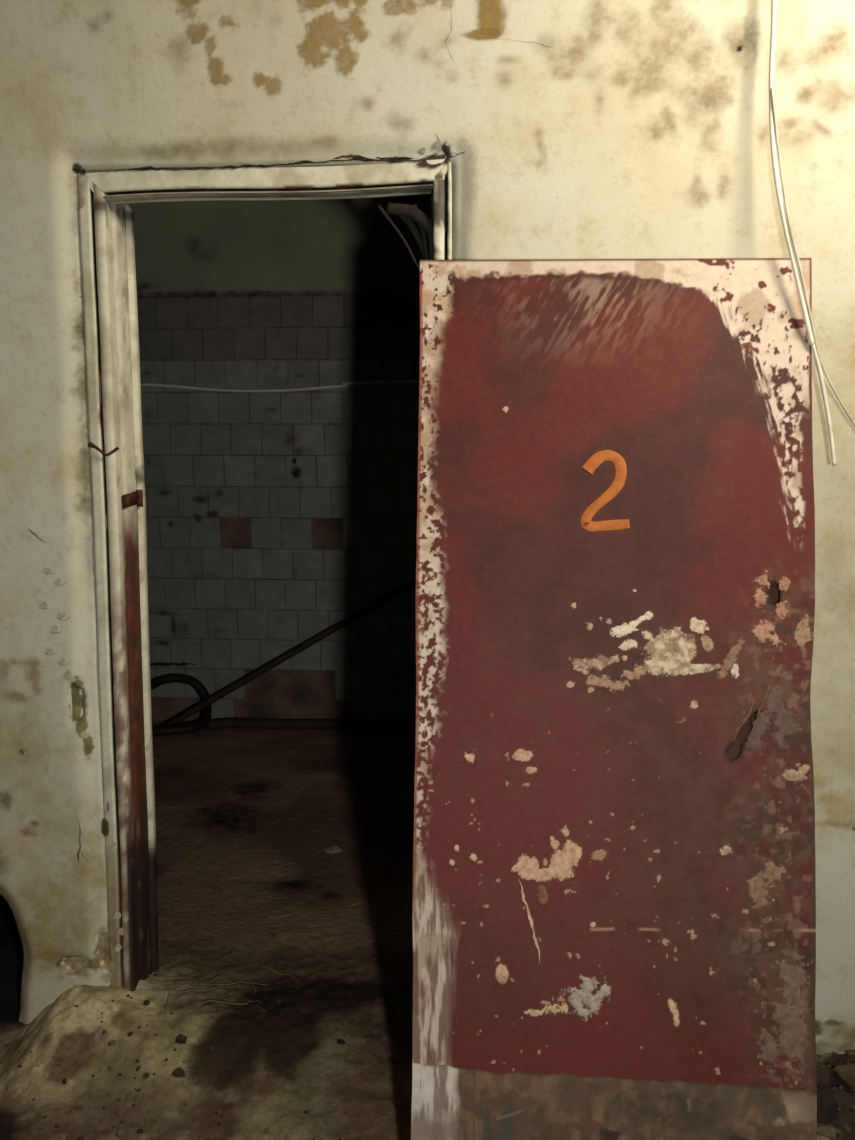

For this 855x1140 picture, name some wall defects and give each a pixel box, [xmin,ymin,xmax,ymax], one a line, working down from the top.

crack [109,134,466,172]
spalling [47,647,94,755]